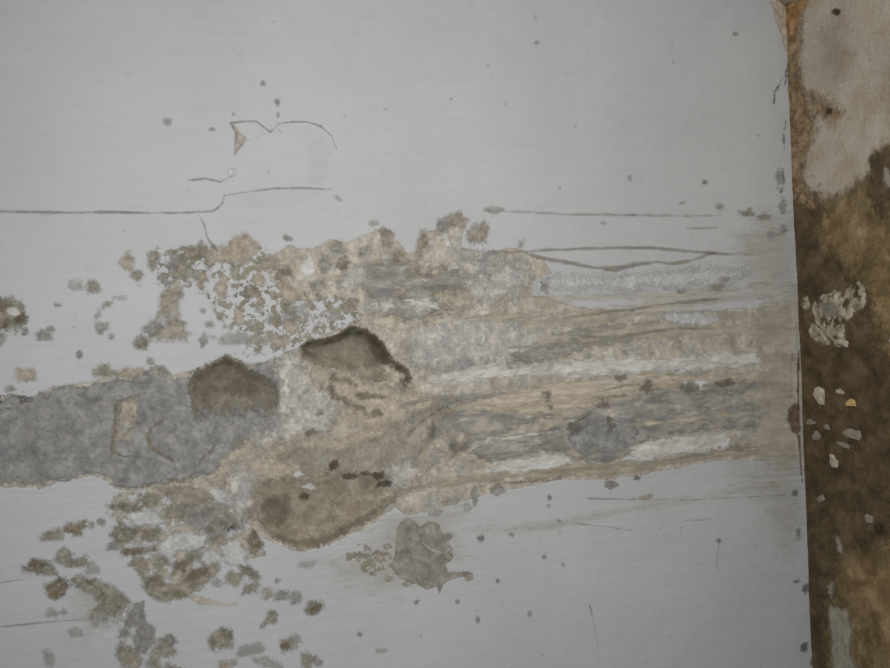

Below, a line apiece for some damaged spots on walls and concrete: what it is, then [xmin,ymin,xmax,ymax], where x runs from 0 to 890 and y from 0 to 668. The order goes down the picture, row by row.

crack [94,208,145,216]
crack [166,121,323,252]
leakage [520,246,782,345]
peeling [0,207,804,668]
leakage [780,145,890,668]